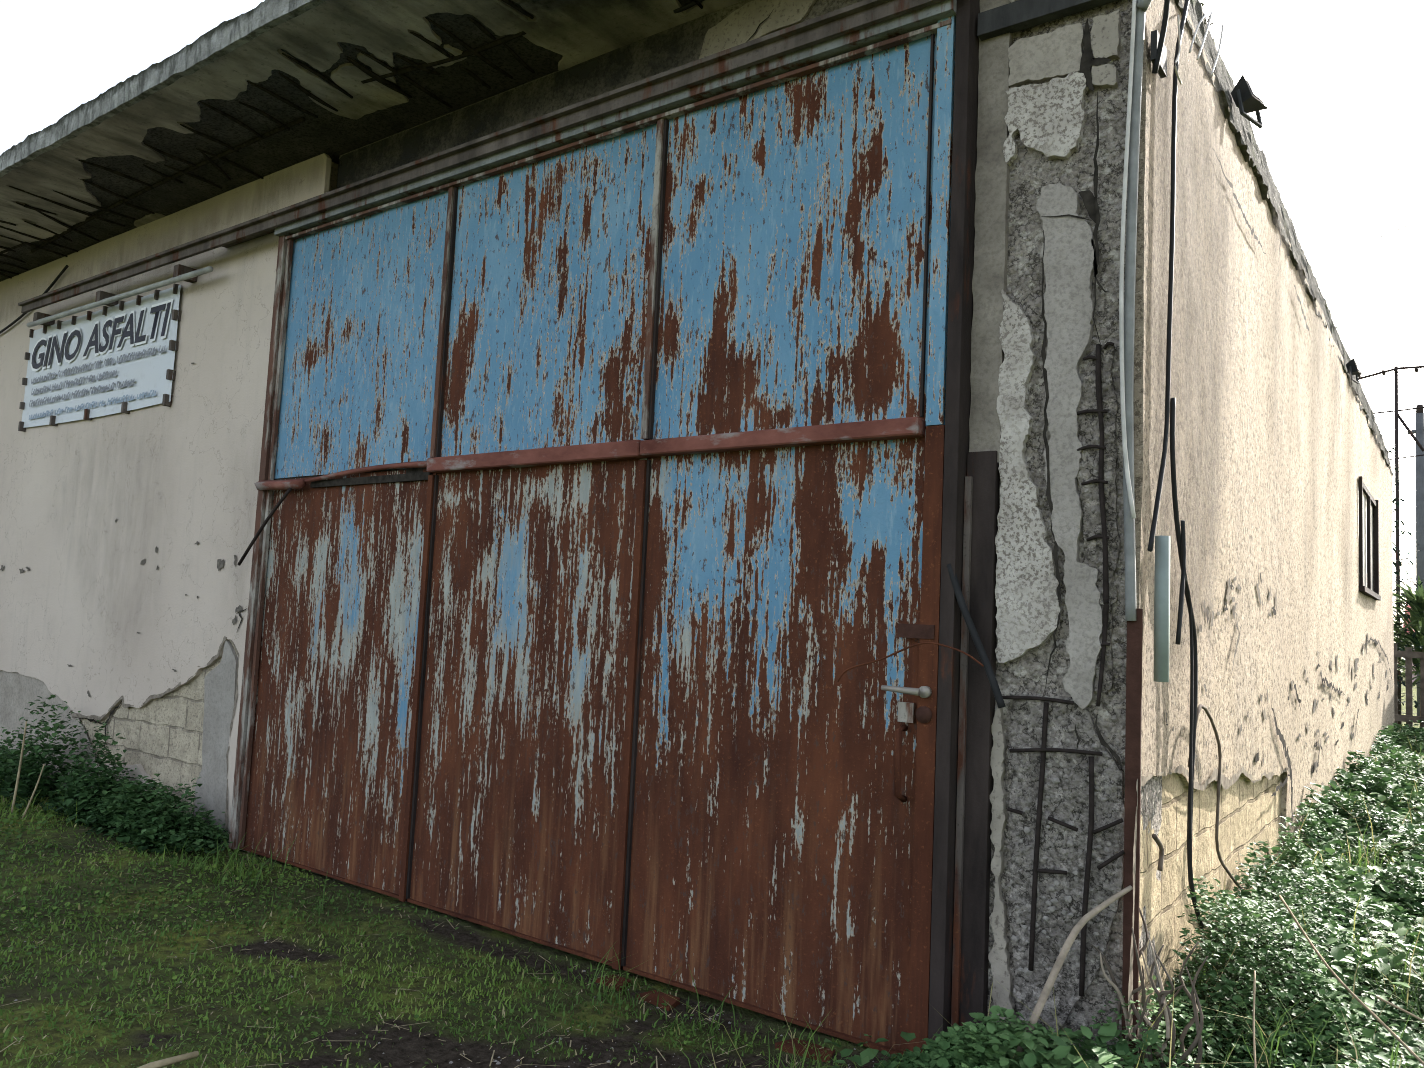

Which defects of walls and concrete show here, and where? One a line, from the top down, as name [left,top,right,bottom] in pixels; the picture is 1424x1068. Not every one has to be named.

spalling [0,0,563,282]
flaking render [1003,10,1121,166]
flaking render [0,605,242,844]
spalling [988,183,1302,1047]
flaking render [1288,633,1389,785]